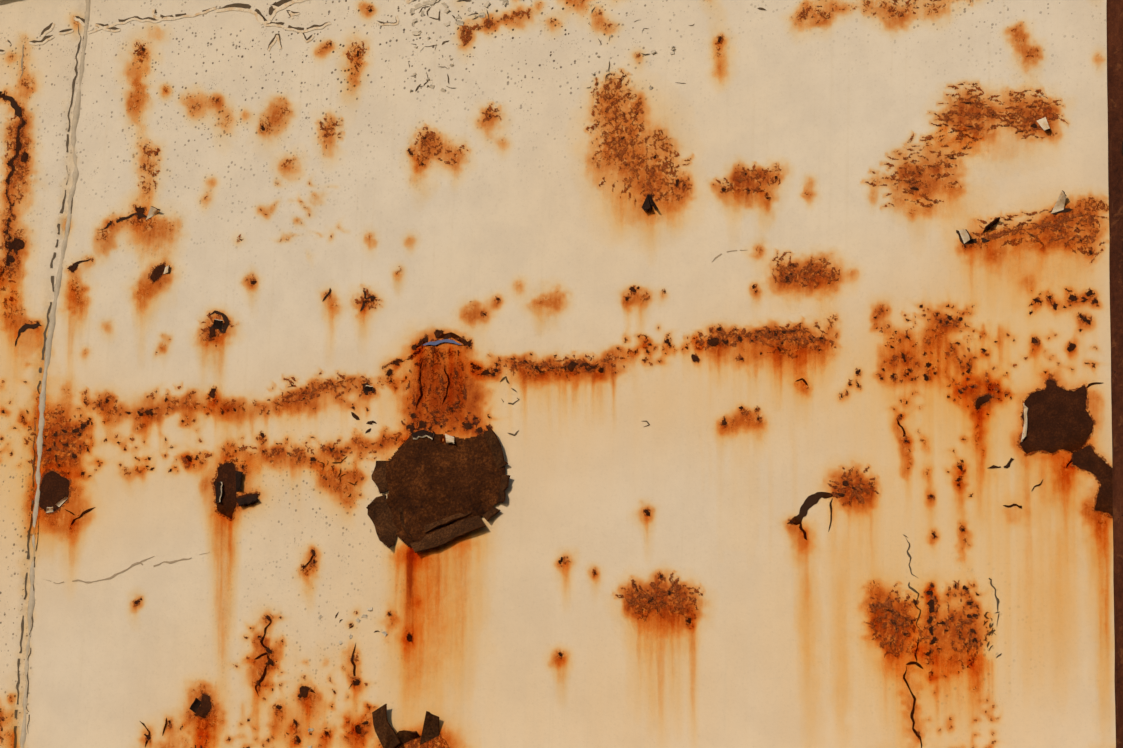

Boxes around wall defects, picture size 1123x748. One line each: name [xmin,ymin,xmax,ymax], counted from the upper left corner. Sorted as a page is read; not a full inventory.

crack [376,0,413,26]
crack [0,45,34,307]
rust [586,70,692,211]
rust [866,82,1067,214]
crack [13,0,331,748]
spalling [211,461,260,521]
rust [0,310,837,477]
spalling [320,428,519,553]
spalling [989,373,1113,529]
crack [903,535,923,748]
rust [867,580,989,693]
spalling [372,704,451,748]